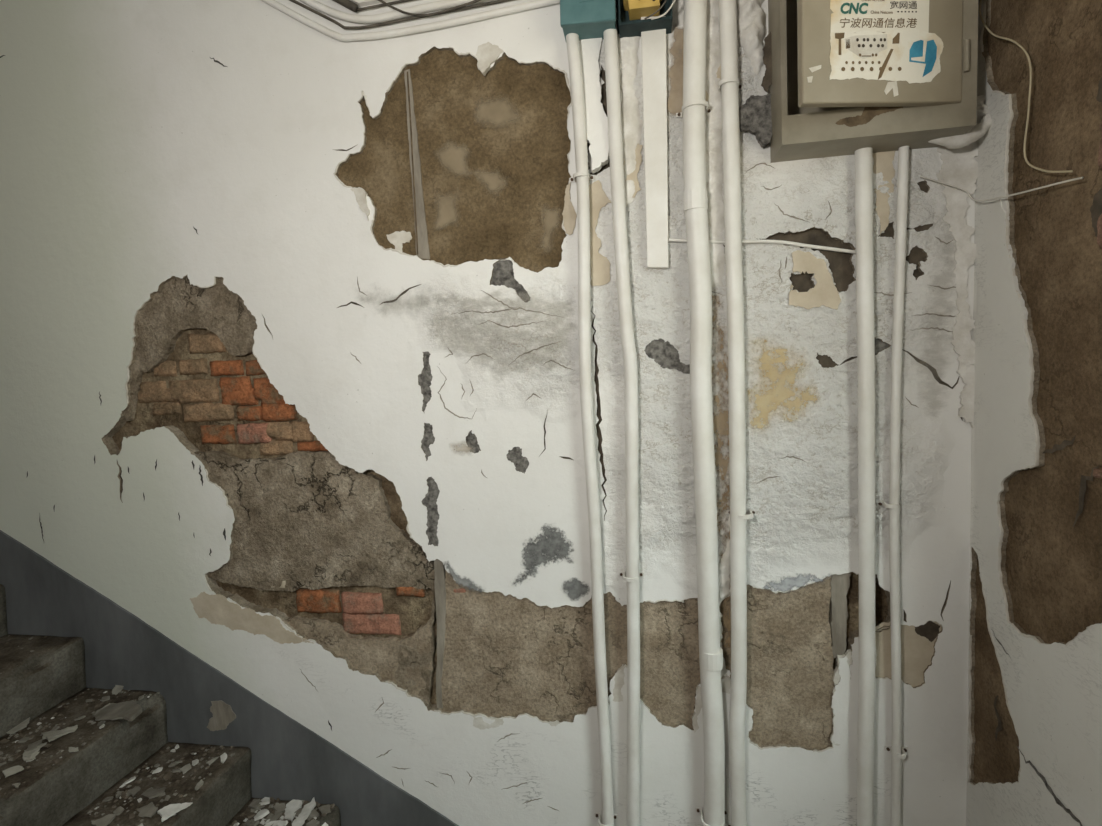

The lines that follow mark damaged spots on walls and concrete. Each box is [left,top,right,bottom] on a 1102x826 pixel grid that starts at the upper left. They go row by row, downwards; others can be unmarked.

peeling [333,38,611,303]
crack [338,277,419,308]
crack [438,290,607,520]
damp [748,340,817,428]
peeling [765,229,854,310]
flaking render [906,0,1102,646]
flaking render [112,276,627,731]
flaking render [640,598,702,733]
flaking render [746,572,859,752]
peeling [875,582,943,687]
peeling [968,553,1021,786]
crack [1017,747,1082,826]